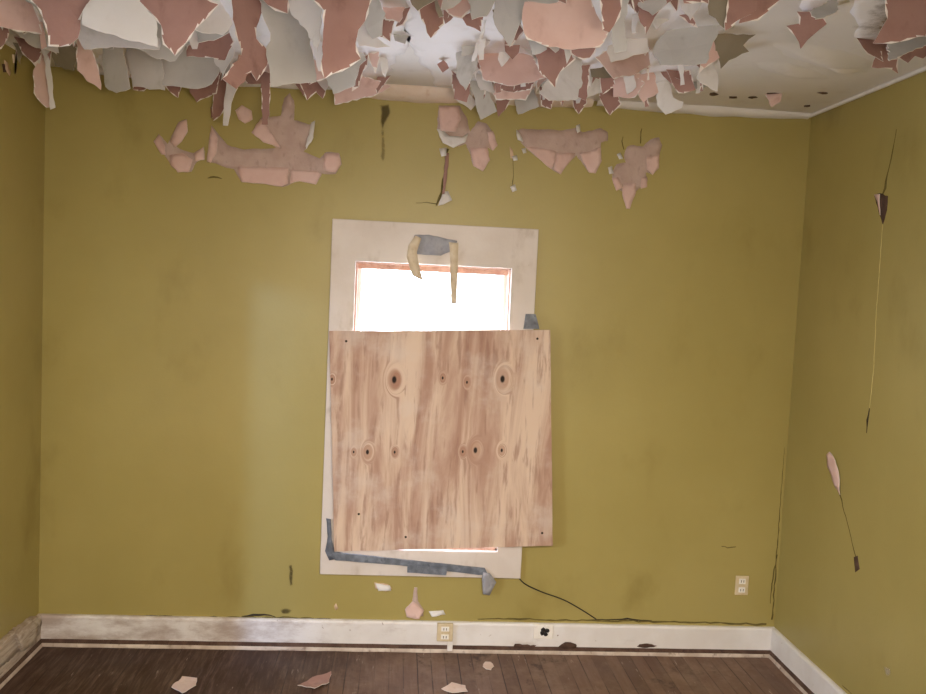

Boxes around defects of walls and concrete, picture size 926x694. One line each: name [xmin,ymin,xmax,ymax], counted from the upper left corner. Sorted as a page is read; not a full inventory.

peeling [0,0,782,209]
peeling [787,0,926,74]
crack [866,129,897,433]
peeling [405,587,445,619]